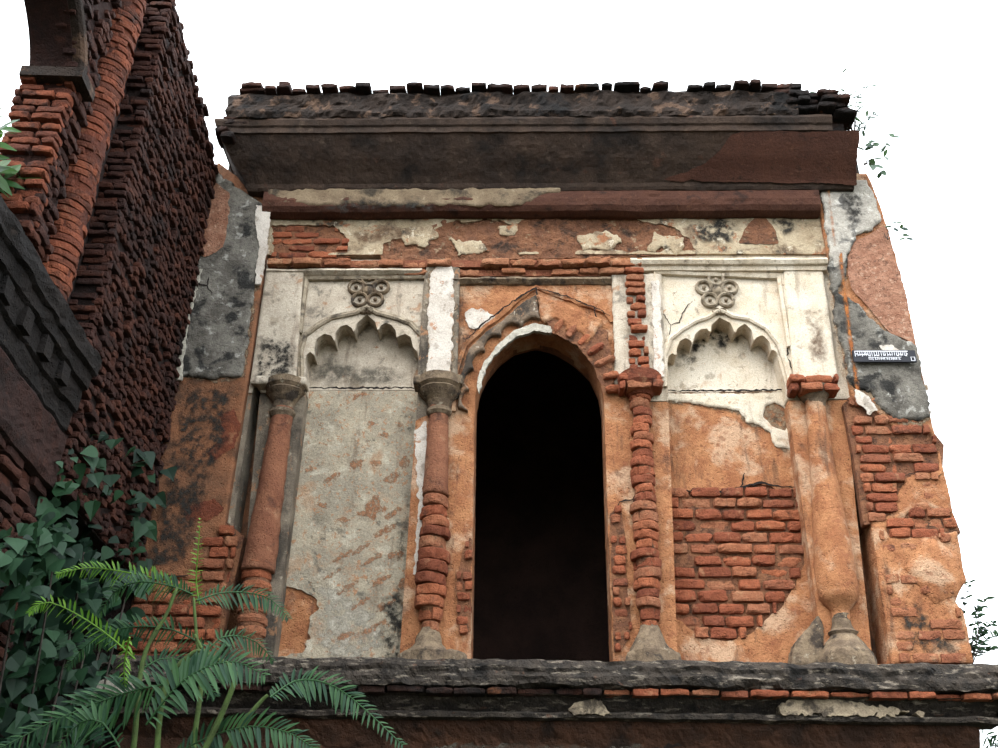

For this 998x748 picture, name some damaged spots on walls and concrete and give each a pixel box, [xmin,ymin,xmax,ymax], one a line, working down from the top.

peeling [175,173,561,383]
peeling [380,218,696,377]
peeling [665,130,961,538]
damp [147,389,229,565]
spalling [117,421,427,658]
spalling [671,484,805,641]